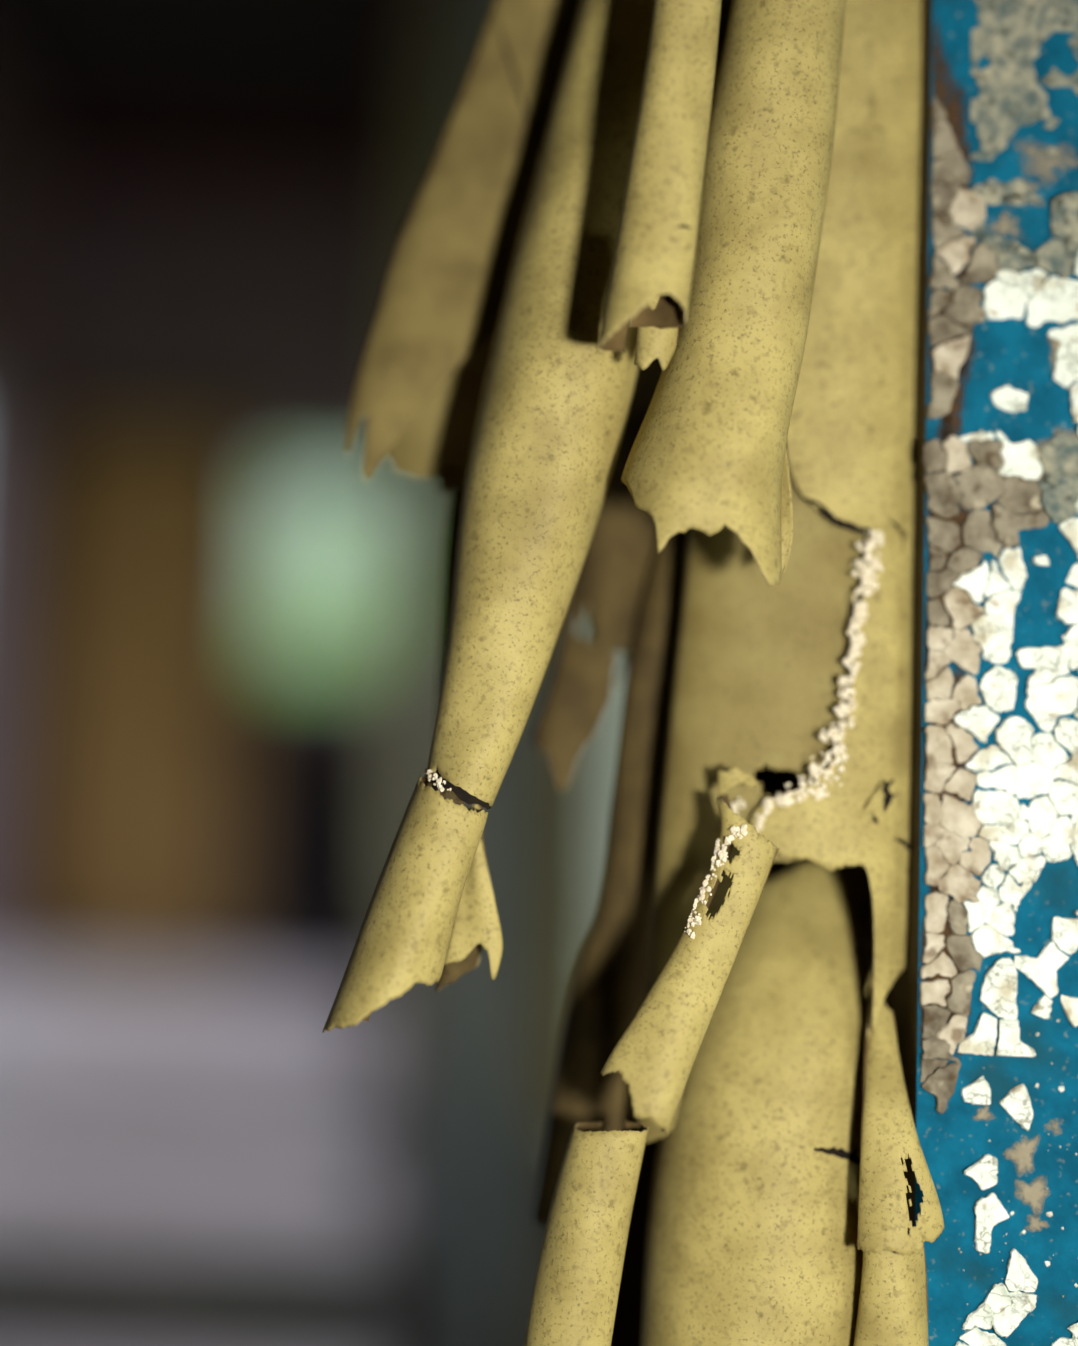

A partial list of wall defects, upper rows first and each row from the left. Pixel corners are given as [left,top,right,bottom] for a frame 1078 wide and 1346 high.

peeling [920,0,1078,1137]
crack [431,777,492,809]
peeling [955,1124,1054,1346]
peeling [1051,1323,1078,1346]